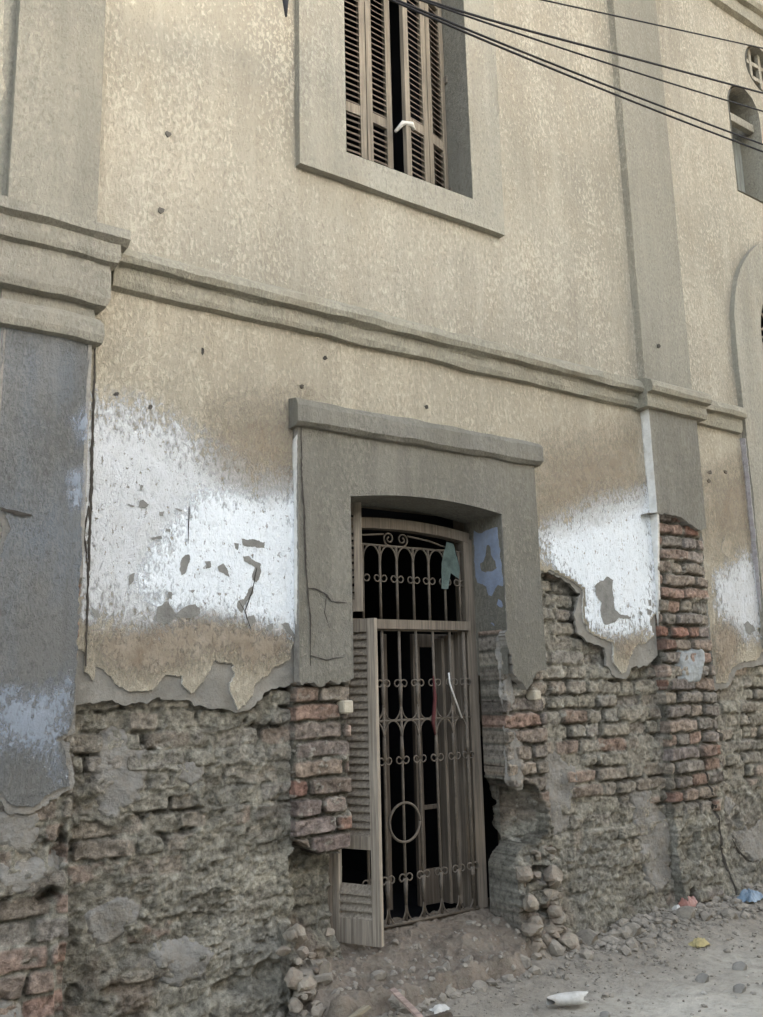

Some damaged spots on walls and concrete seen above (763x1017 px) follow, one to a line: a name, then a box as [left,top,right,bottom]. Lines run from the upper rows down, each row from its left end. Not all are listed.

crack [84,348,96,666]
peeling [155,590,200,624]
peeling [179,554,190,575]
peeling [205,561,229,577]
peeling [234,435,298,636]
crack [300,427,346,666]
peeling [473,527,506,609]
flaking render [478,514,763,960]
flaking render [0,678,353,1017]